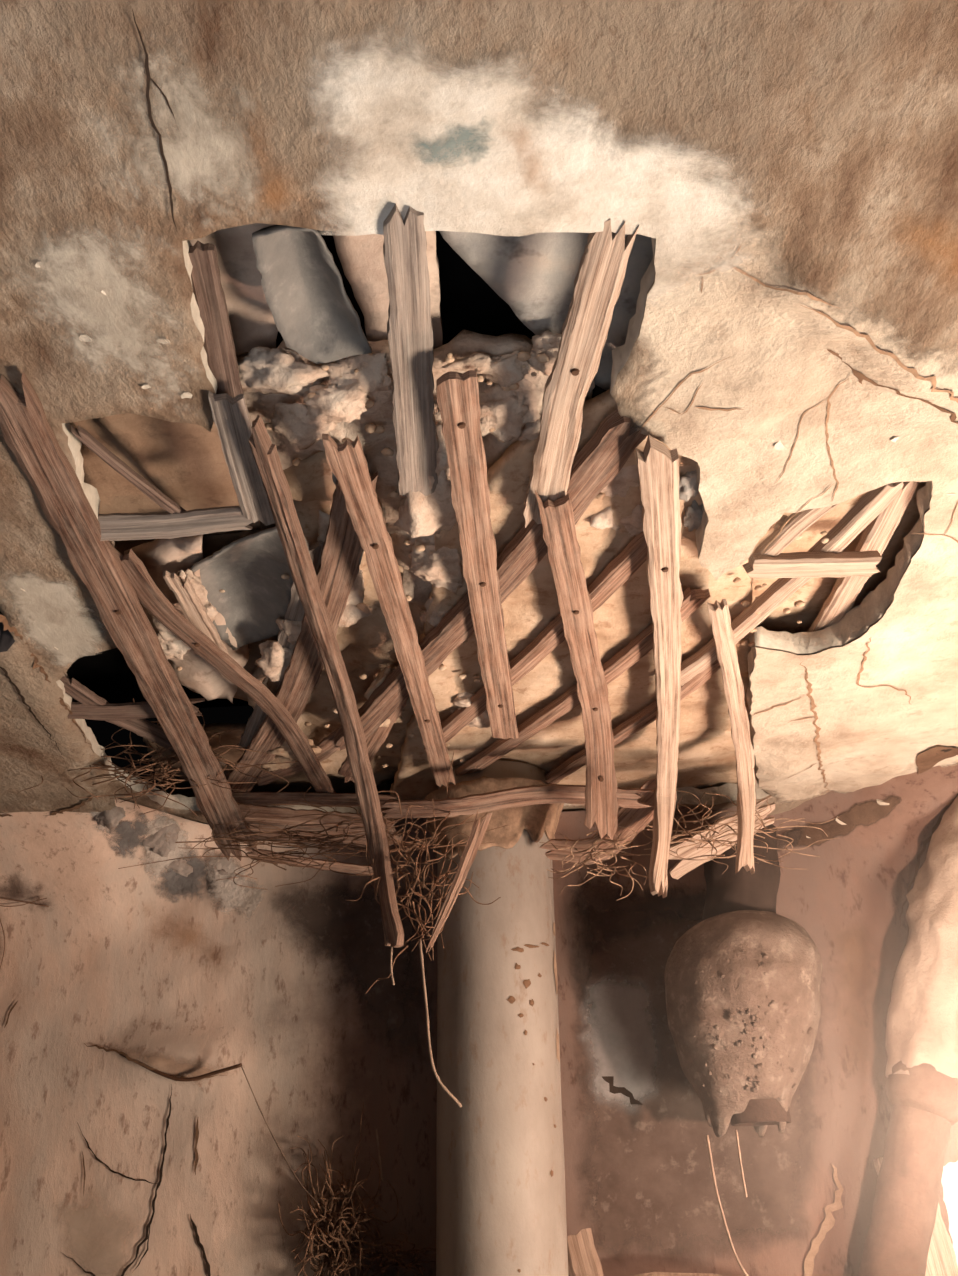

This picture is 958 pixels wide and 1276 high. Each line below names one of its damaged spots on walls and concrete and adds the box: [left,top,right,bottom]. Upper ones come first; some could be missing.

crack [132,10,176,227]
peeling [15,231,192,399]
peeling [316,43,958,851]
crack [684,246,958,558]
crack [0,615,92,759]
peeling [6,573,103,666]
crack [45,795,97,816]
flaking render [91,806,262,918]
crack [61,1086,172,1276]